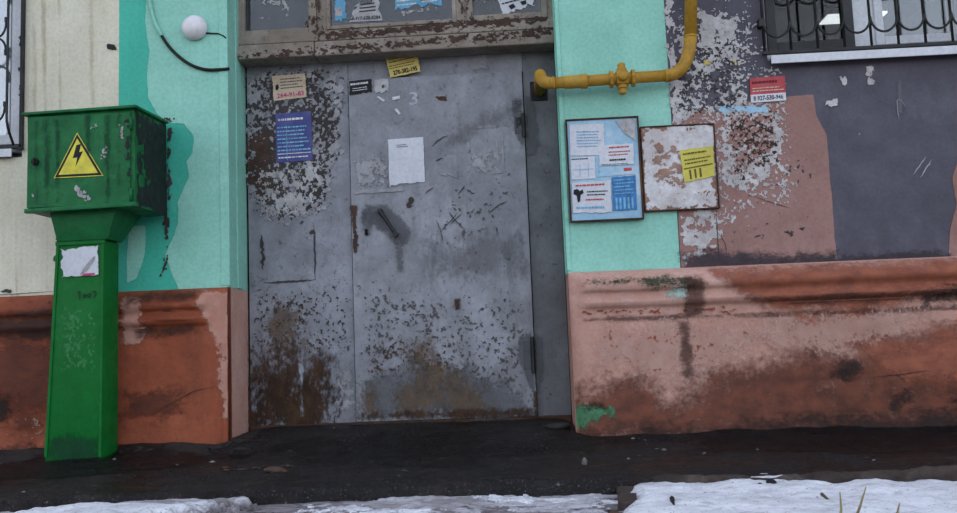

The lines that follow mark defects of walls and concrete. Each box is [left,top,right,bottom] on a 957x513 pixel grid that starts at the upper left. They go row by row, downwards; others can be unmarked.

peeling [663,0,684,68]
peeling [237,0,553,226]
peeling [668,0,812,265]
peeling [349,205,359,253]
damp [0,316,52,431]
damp [0,435,212,479]
damp [119,389,184,417]
corrosion [248,302,342,431]
corrosion [358,391,538,419]
damp [575,247,957,453]